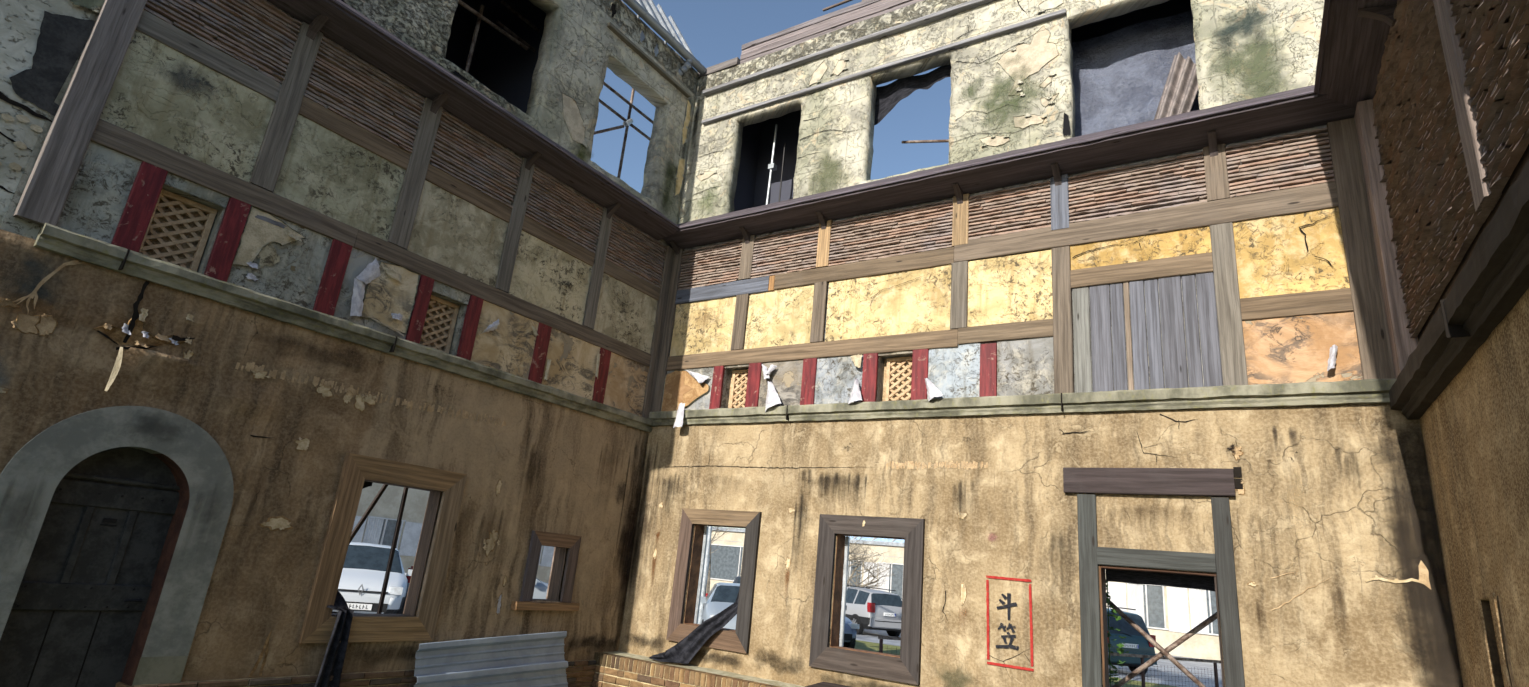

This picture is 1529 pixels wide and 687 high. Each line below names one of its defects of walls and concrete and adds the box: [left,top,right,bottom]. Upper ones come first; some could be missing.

water stain [607,0,996,98]
water stain [693,8,1067,131]
crack [1299,215,1334,268]
spalling [93,308,194,360]
flaking render [316,384,377,412]
flaking render [259,515,293,531]
water stain [617,448,649,593]